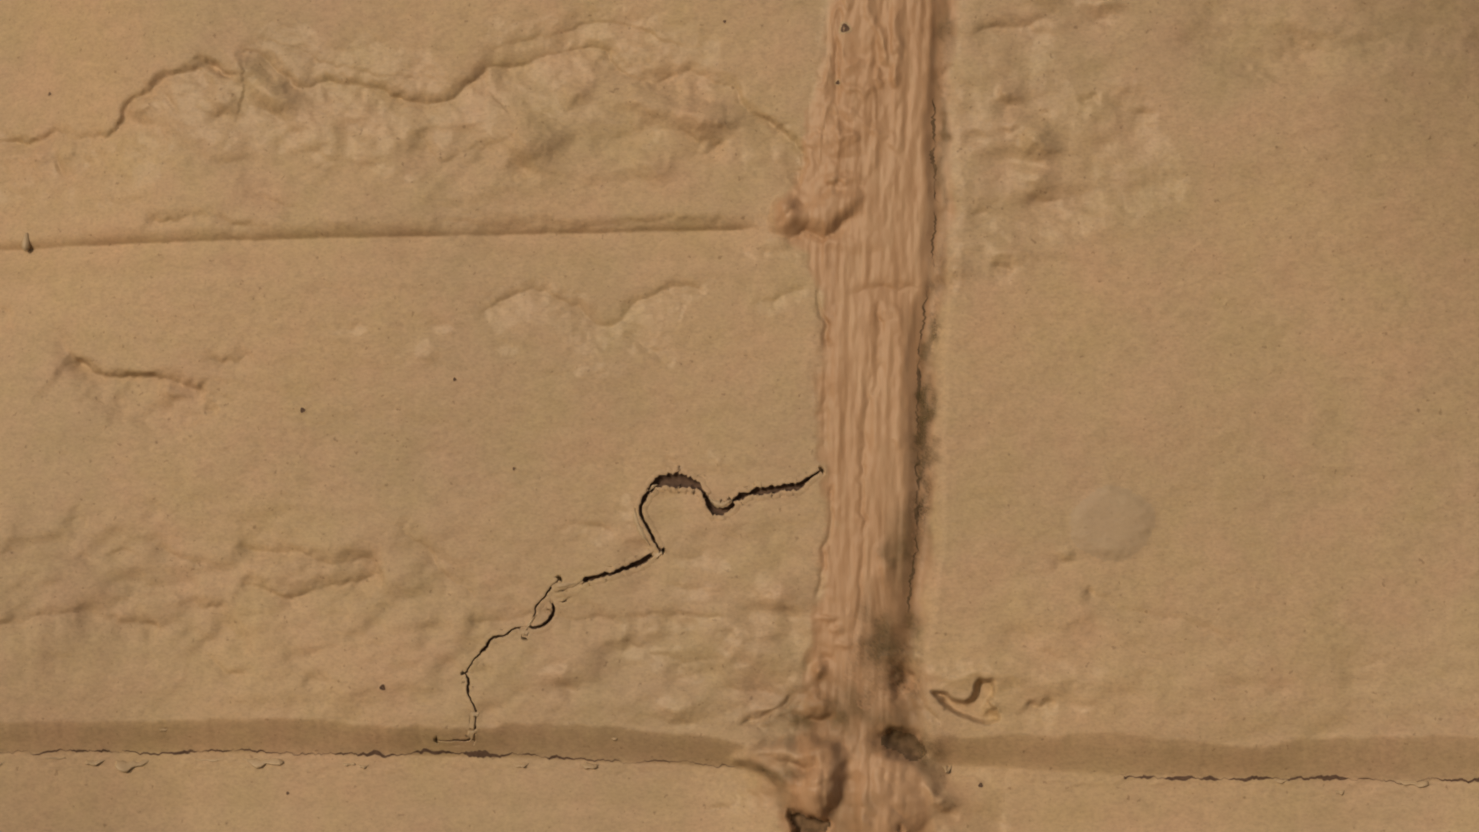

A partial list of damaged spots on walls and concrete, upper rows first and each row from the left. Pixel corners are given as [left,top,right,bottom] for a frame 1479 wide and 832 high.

peeling [0,4,811,249]
crack [0,465,824,768]
peeling [740,613,856,736]
spalling [881,729,927,761]
spalling [934,681,999,725]
hole [790,811,831,832]